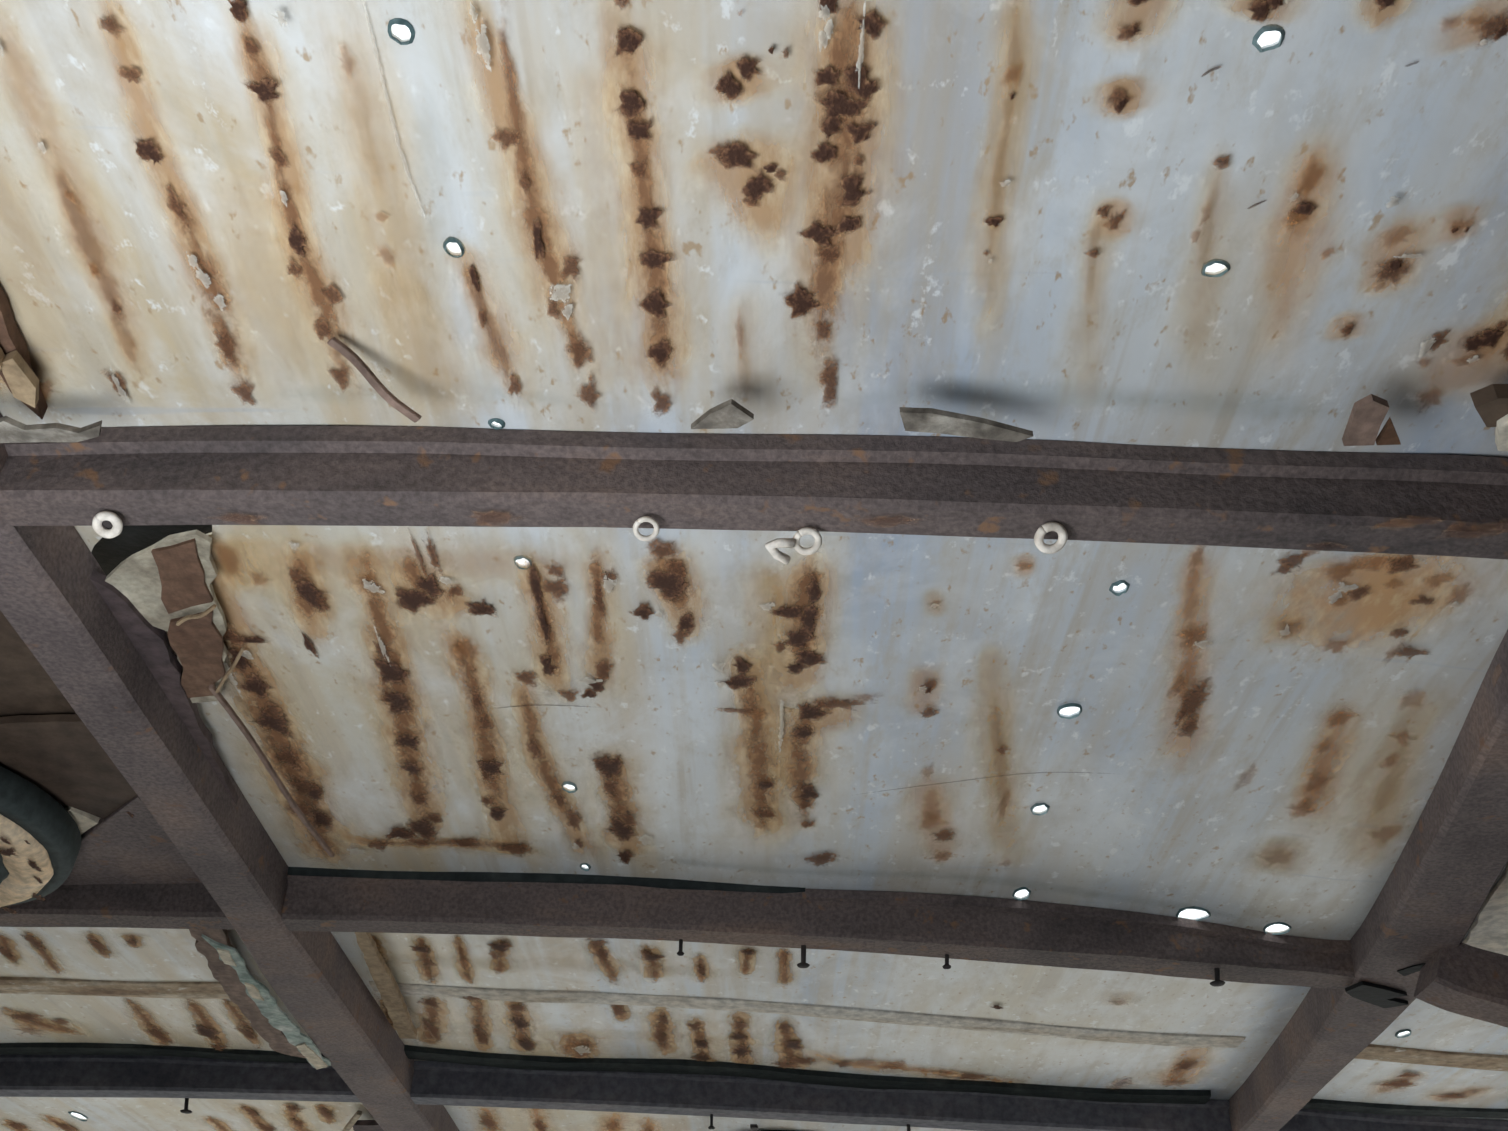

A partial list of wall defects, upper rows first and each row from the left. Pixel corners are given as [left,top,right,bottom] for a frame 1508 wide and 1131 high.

rust [100,11,254,405]
rust [228,0,348,390]
rust [464,2,599,408]
rust [605,28,685,414]
rust [708,140,786,232]
rust [716,47,789,100]
rust [783,0,888,342]
peeling [0,416,102,443]
rust [151,533,617,861]
rust [592,755,654,864]
rust [713,556,864,835]
rust [453,937,535,1051]